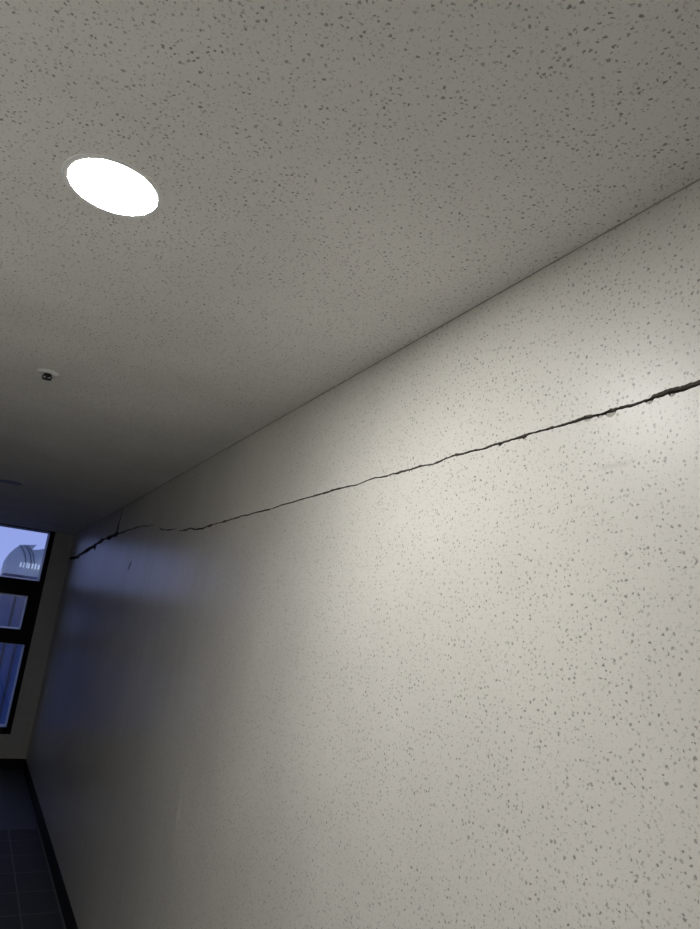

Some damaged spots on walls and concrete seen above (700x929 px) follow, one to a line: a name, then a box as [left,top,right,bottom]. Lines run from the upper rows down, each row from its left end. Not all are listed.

crack [69,380,700,559]